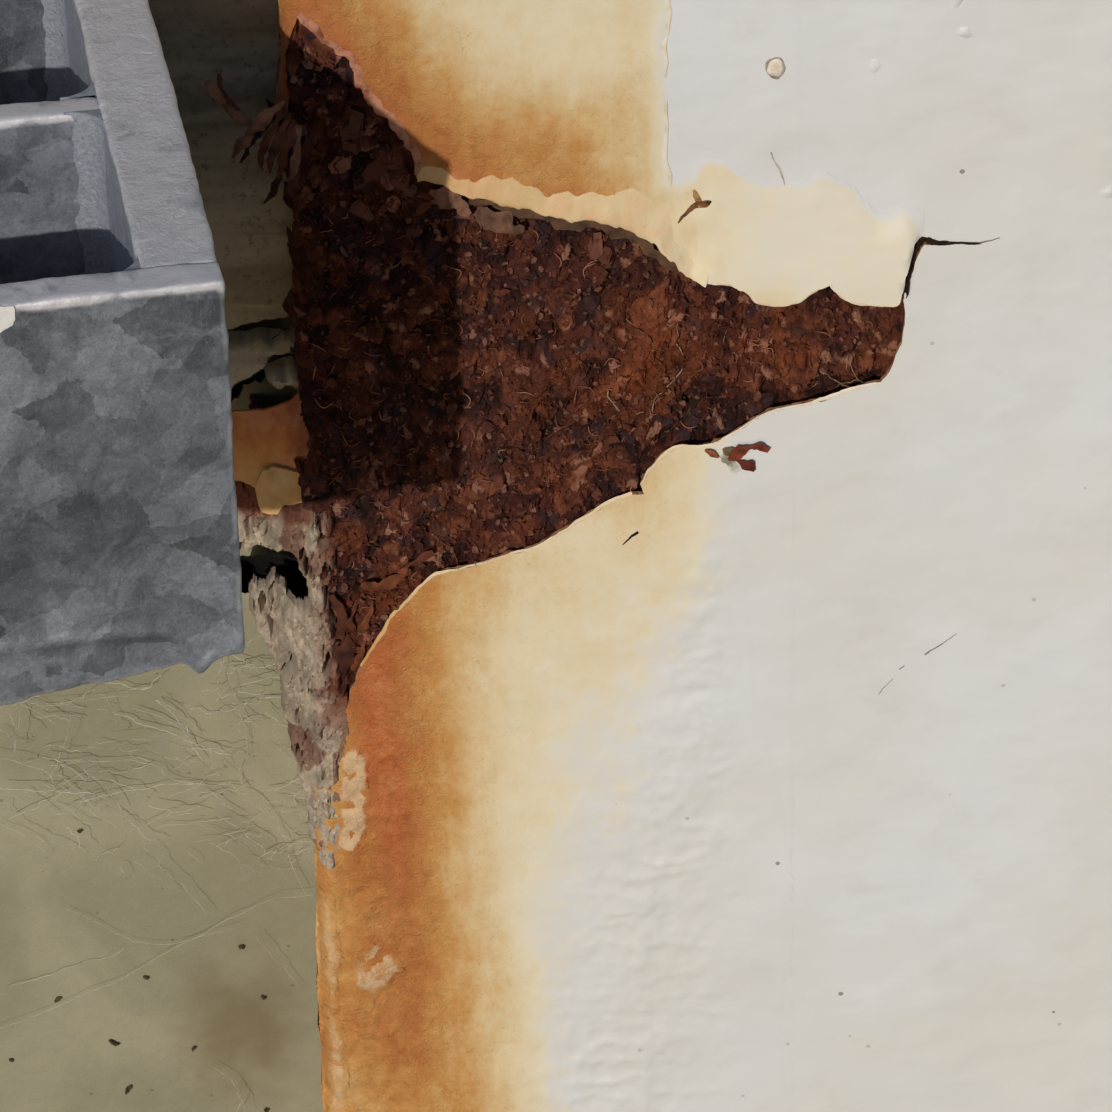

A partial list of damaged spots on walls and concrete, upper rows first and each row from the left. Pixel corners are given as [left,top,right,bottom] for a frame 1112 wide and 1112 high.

rust [275,0,803,253]
spalling [204,13,905,699]
crack [903,236,1000,298]
peeling [331,742,371,856]